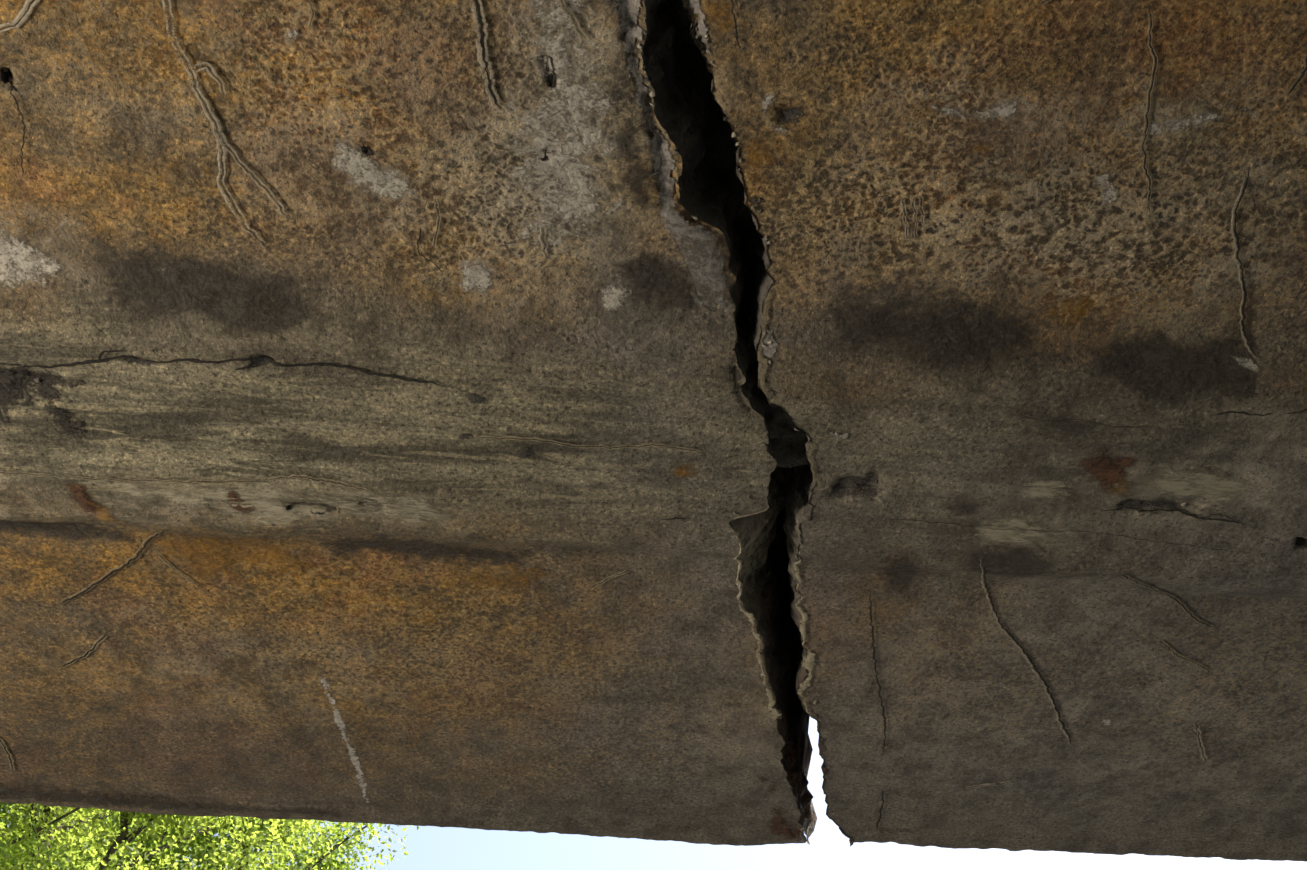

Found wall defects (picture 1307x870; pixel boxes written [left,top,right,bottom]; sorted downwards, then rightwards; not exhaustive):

crack [0,0,40,33]
crack [162,0,290,253]
crack [470,0,510,114]
crack [1141,2,1158,229]
crack [1283,54,1307,103]
water stain [96,250,331,338]
crack [1230,165,1262,361]
crack [0,350,457,389]
crack [464,436,713,454]
crack [641,0,886,846]
water stain [1099,334,1258,403]
crack [980,560,1074,753]